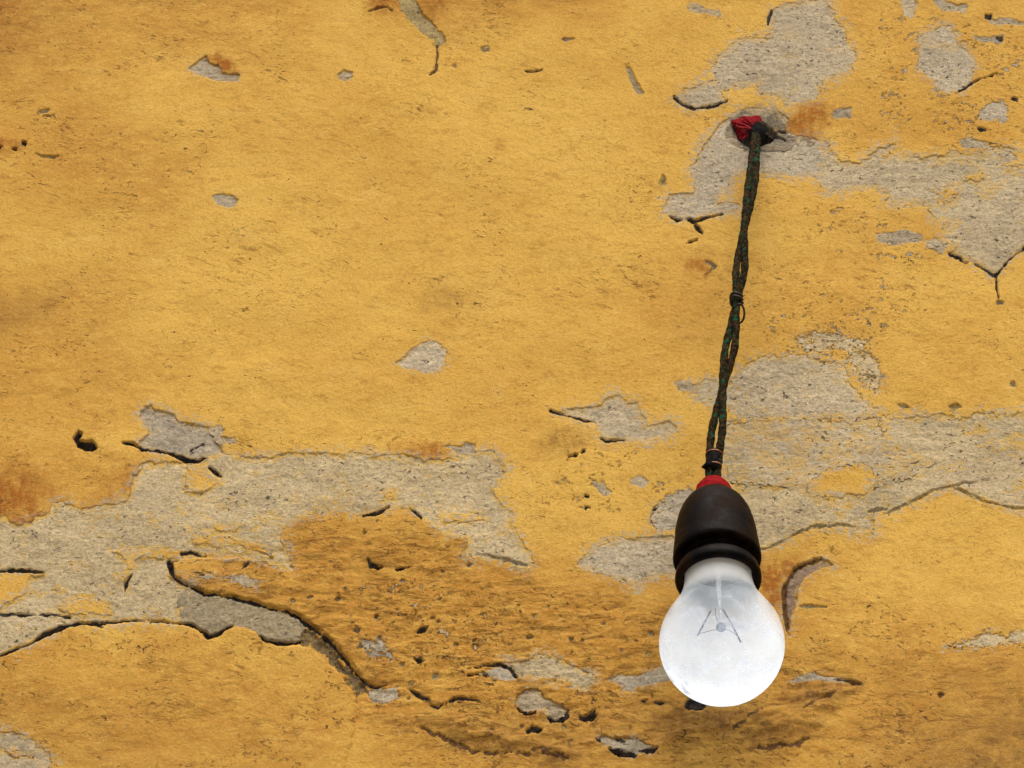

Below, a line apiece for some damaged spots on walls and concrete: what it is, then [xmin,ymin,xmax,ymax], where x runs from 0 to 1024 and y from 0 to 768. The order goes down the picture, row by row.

peeling [659,0,1024,274]
crack [948,247,1024,299]
peeling [396,340,447,374]
peeling [559,395,677,453]
peeling [674,279,1024,549]
peeling [0,407,534,655]
peeling [577,476,695,584]
crack [761,479,1024,550]
crack [0,551,382,690]
peeling [479,638,596,743]
peeling [607,667,670,706]
peeling [596,729,658,759]